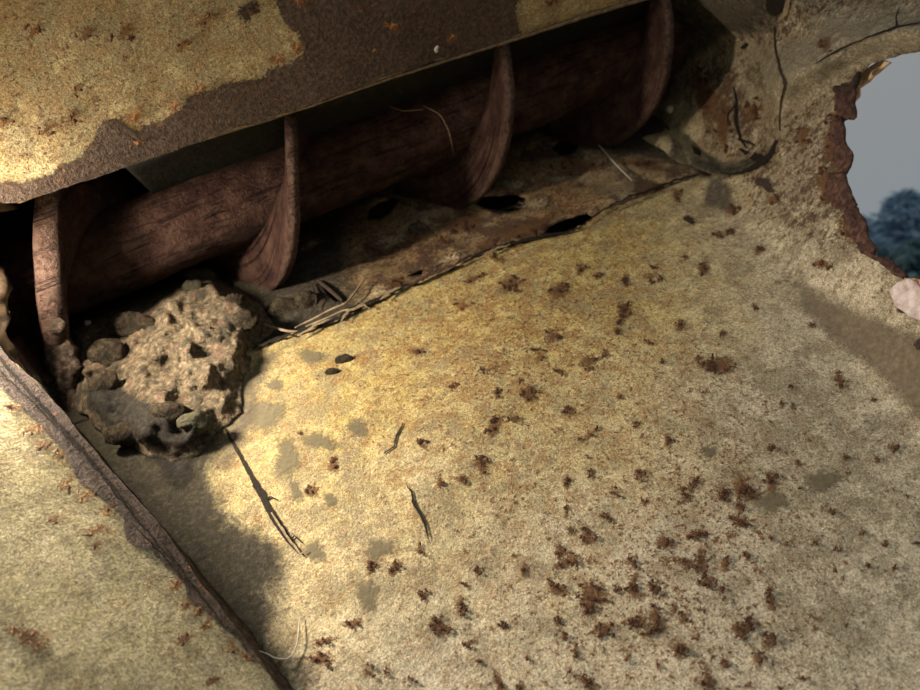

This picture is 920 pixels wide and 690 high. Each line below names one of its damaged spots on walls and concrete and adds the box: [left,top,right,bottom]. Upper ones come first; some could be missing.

crack [815,7,920,64]
peeling [0,0,522,203]
corrosion [795,60,920,285]
peeling [889,278,920,320]
corrosion [484,410,522,441]
crack [224,428,307,554]
corrosion [715,470,779,530]
corrosion [545,499,689,641]
corrosion [653,529,732,601]
corrosion [428,581,478,648]
corrosion [553,612,601,690]
corrosion [724,583,779,668]